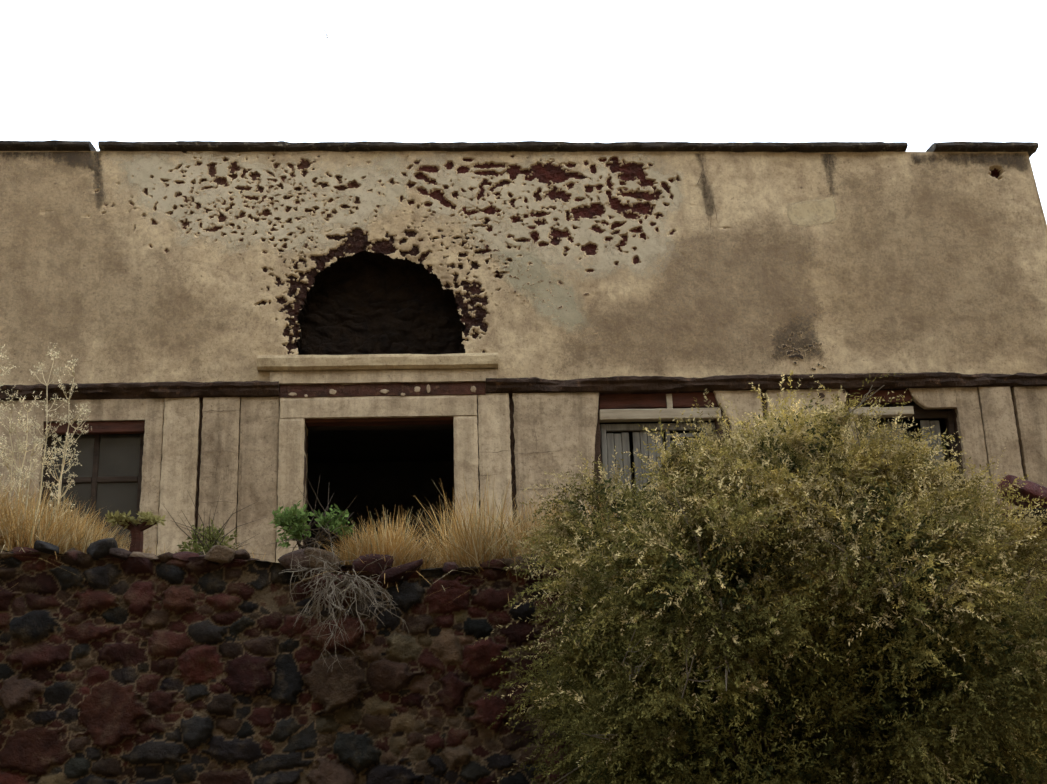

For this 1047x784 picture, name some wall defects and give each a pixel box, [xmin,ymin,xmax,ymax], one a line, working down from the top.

water stain [0,152,103,206]
flaking render [118,152,683,354]
water stain [570,217,824,370]
water stain [701,177,713,212]